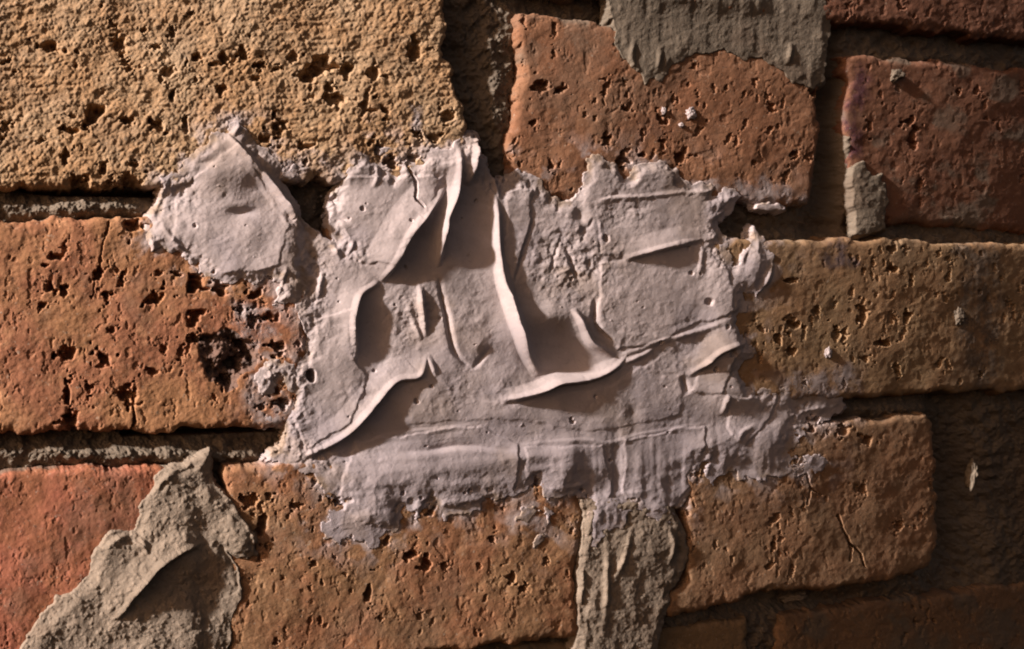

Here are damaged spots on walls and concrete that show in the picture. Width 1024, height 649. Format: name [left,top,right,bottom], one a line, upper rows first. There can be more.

peeling [374,146,393,163]
spalling [615,144,633,172]
spalling [674,147,694,166]
peeling [743,201,786,216]
spalling [140,273,292,392]
spalling [782,314,807,338]
peeling [515,506,555,548]